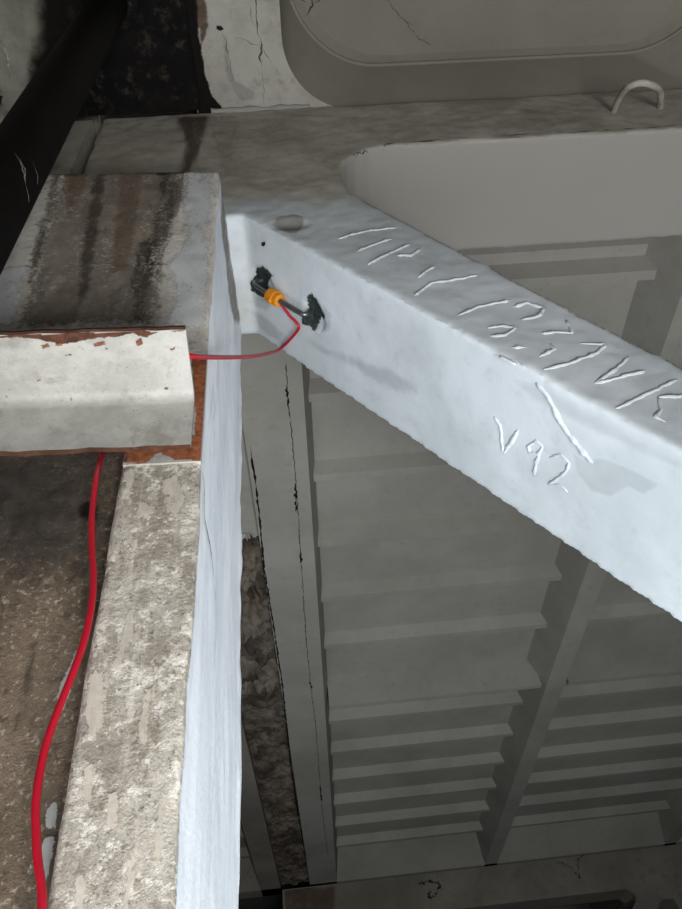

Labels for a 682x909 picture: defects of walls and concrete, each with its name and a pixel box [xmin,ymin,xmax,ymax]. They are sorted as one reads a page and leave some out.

water stain [30,0,67,80]
water stain [179,0,222,171]
crack [241,0,269,98]
water stain [21,173,175,327]
rust [0,329,157,356]
rust [124,359,207,464]
crack [250,365,328,858]
crack [418,880,441,899]